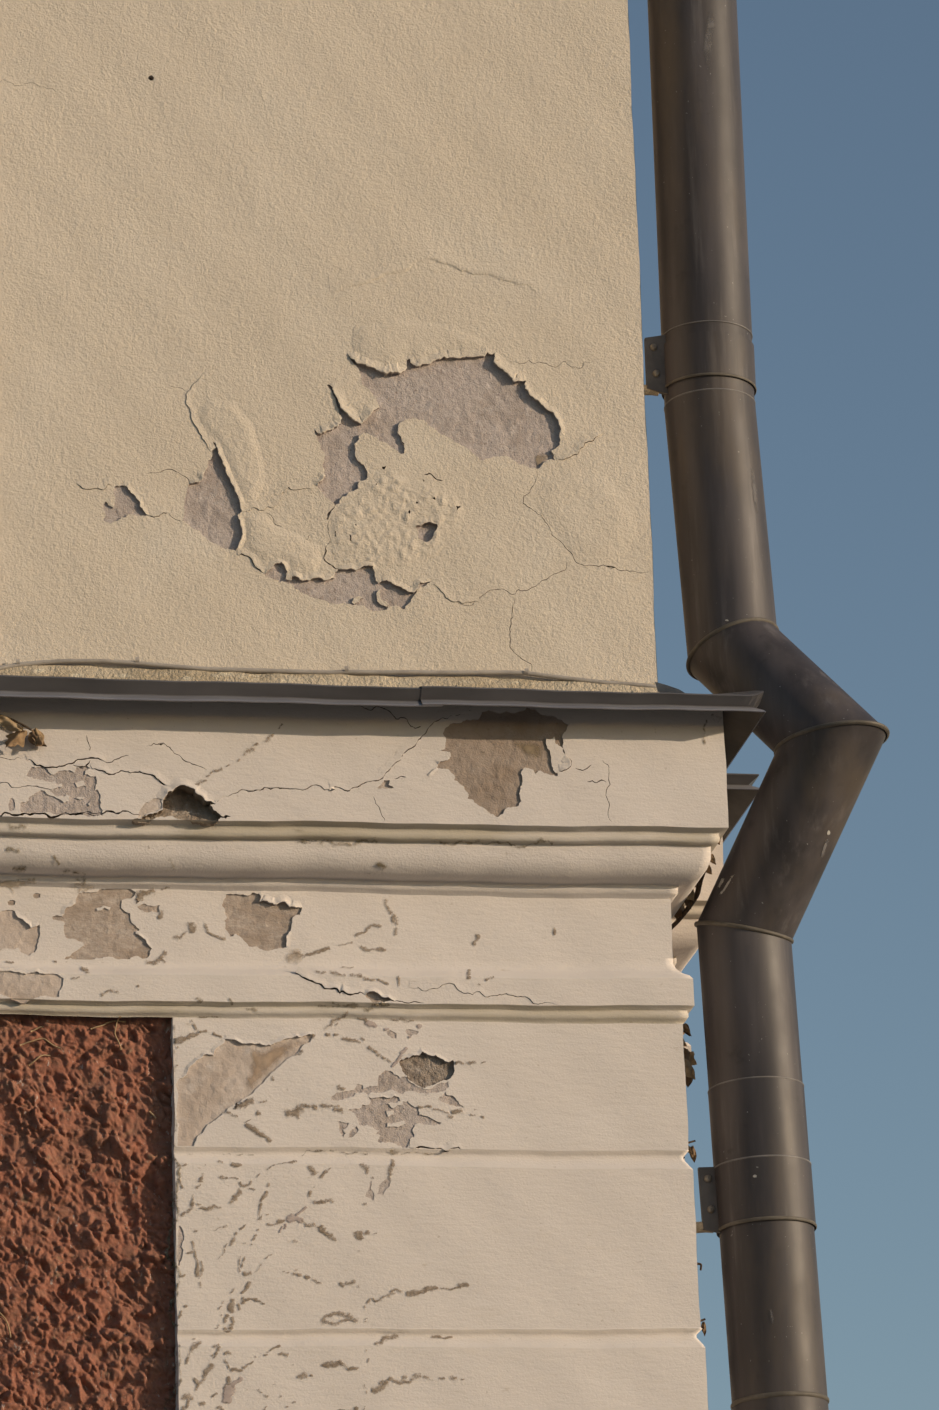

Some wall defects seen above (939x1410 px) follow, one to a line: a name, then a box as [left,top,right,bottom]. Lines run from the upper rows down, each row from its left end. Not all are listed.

peeling [182,439,247,552]
peeling [264,342,567,611]
crack [434,428,650,671]
spalling [132,778,230,827]
crack [0,705,469,820]
peeling [427,707,568,817]
crack [559,756,612,822]
peeling [0,879,160,1004]
peeling [222,891,302,951]
crack [296,966,559,1005]
peeling [176,1030,315,1146]
peeling [331,1029,463,1148]